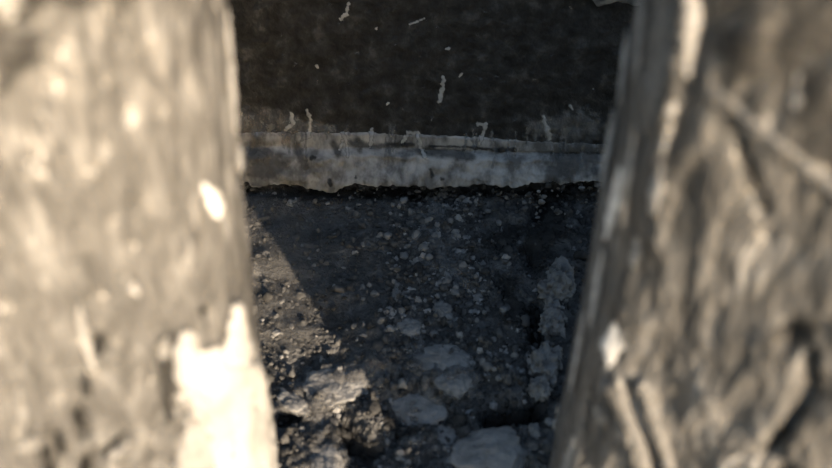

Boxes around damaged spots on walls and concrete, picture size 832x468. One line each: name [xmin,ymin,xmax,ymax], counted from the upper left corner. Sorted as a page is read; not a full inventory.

leakage [62,0,95,11]
leakage [0,0,51,91]
leakage [202,0,475,255]
leakage [476,122,488,146]
leakage [189,183,224,229]
leakage [181,238,195,275]
leakage [278,414,296,426]
leakage [341,424,385,460]
leakage [386,413,468,439]